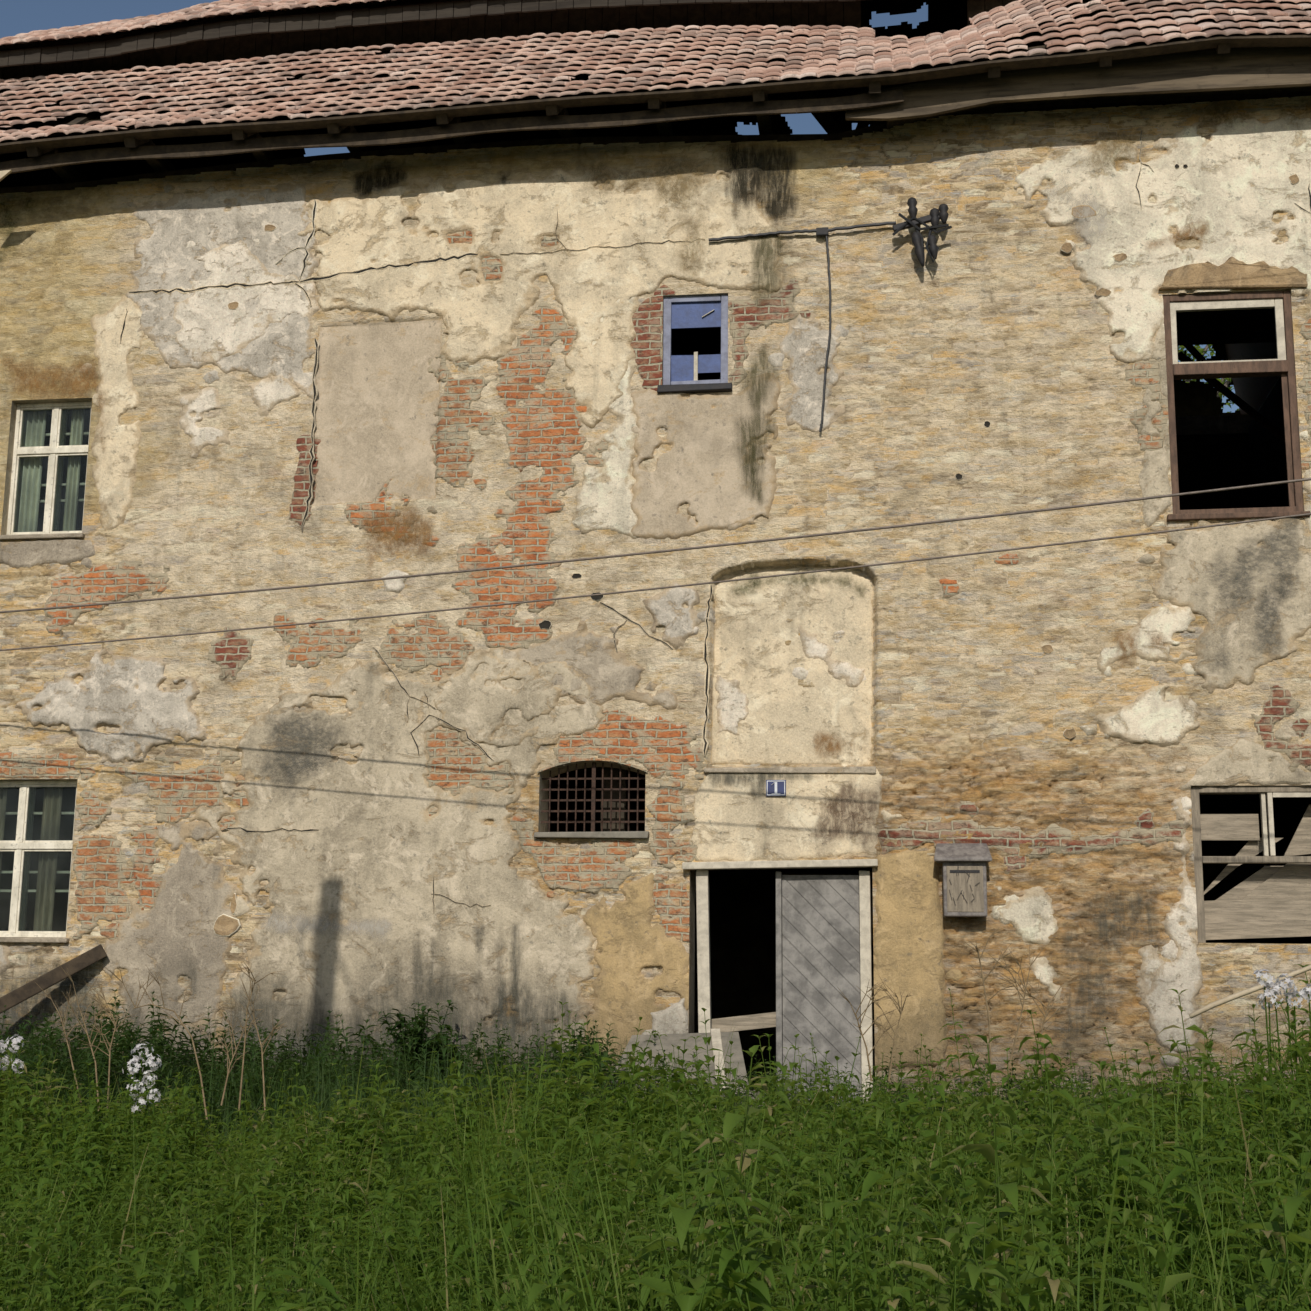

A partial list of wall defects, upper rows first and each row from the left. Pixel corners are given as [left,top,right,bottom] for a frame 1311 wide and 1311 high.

crack [120,200,705,344]
leakage [725,145,794,219]
leakage [755,236,779,293]
crack [1294,183,1311,238]
crack [301,338,319,533]
leakage [741,355,770,488]
peeling [0,113,1311,1076]
leakage [1234,529,1297,648]
leakage [265,718,330,774]
crack [373,647,494,761]
crack [600,585,714,756]